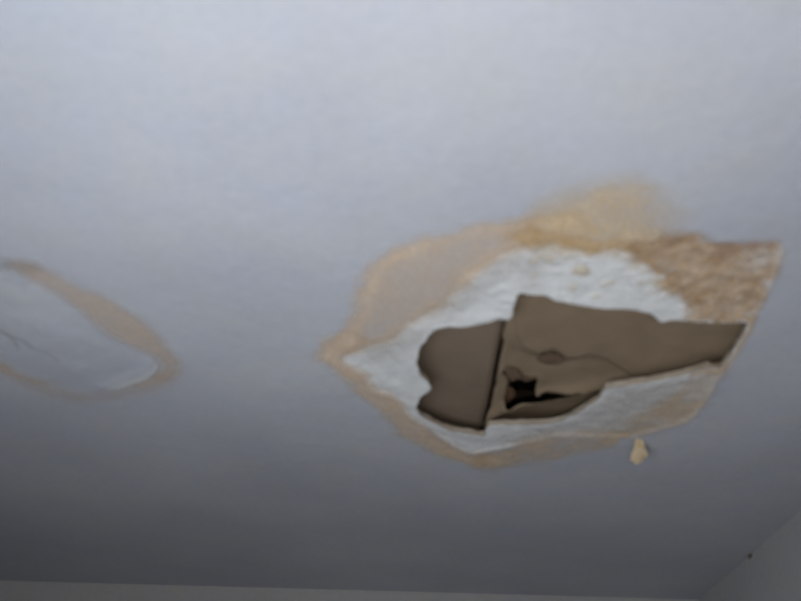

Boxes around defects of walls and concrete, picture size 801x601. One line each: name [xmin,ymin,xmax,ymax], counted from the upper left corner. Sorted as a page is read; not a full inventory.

water stain [320,187,779,468]
spalling [341,240,783,464]